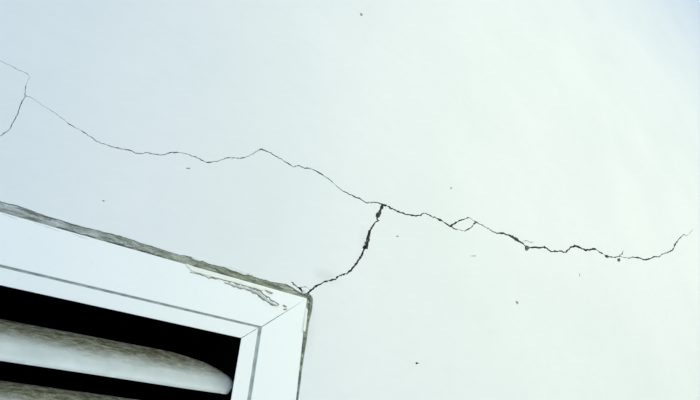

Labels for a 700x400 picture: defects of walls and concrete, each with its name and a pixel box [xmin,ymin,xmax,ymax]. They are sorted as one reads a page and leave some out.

peeling [186,256,287,310]
crack [1,61,688,294]